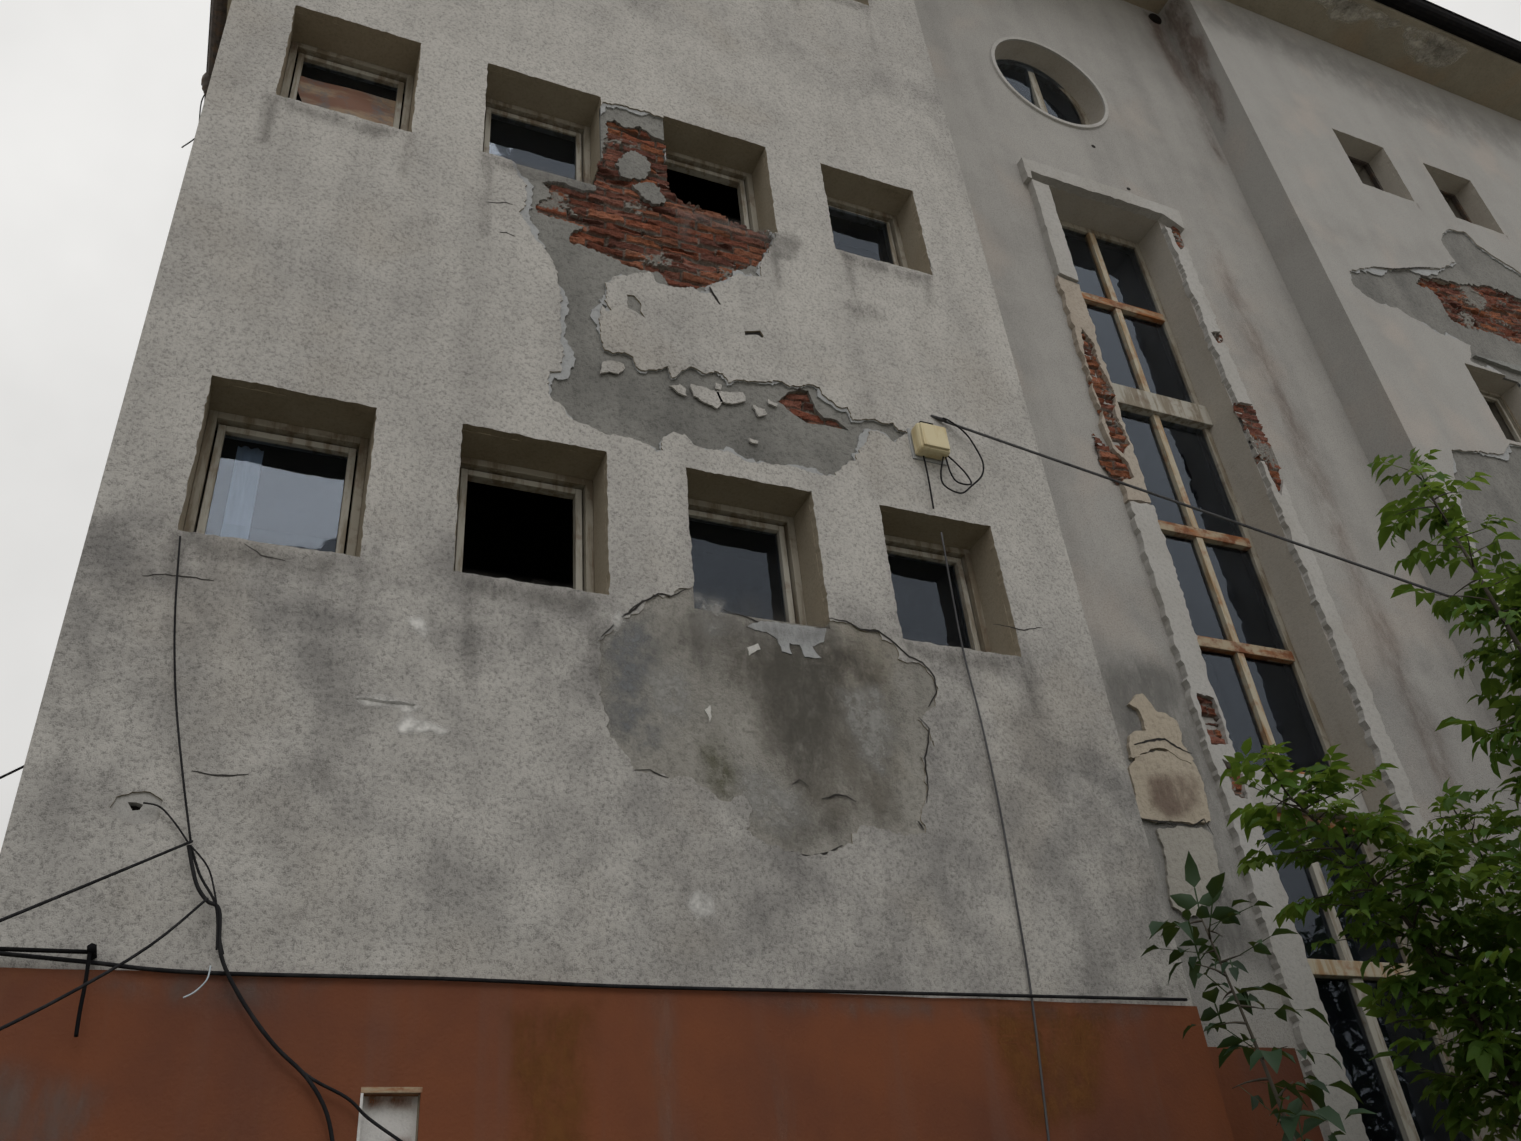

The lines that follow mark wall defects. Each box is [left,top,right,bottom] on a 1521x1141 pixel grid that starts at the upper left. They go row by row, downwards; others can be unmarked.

flaking render [512,103,907,476]
flaking render [1350,230,1521,388]
flaking render [1082,334,1132,486]
flaking render [1233,403,1281,492]
flaking render [1452,444,1521,585]
flaking render [598,587,938,856]
flaking render [1197,696,1226,745]
rust [369,1096,407,1106]